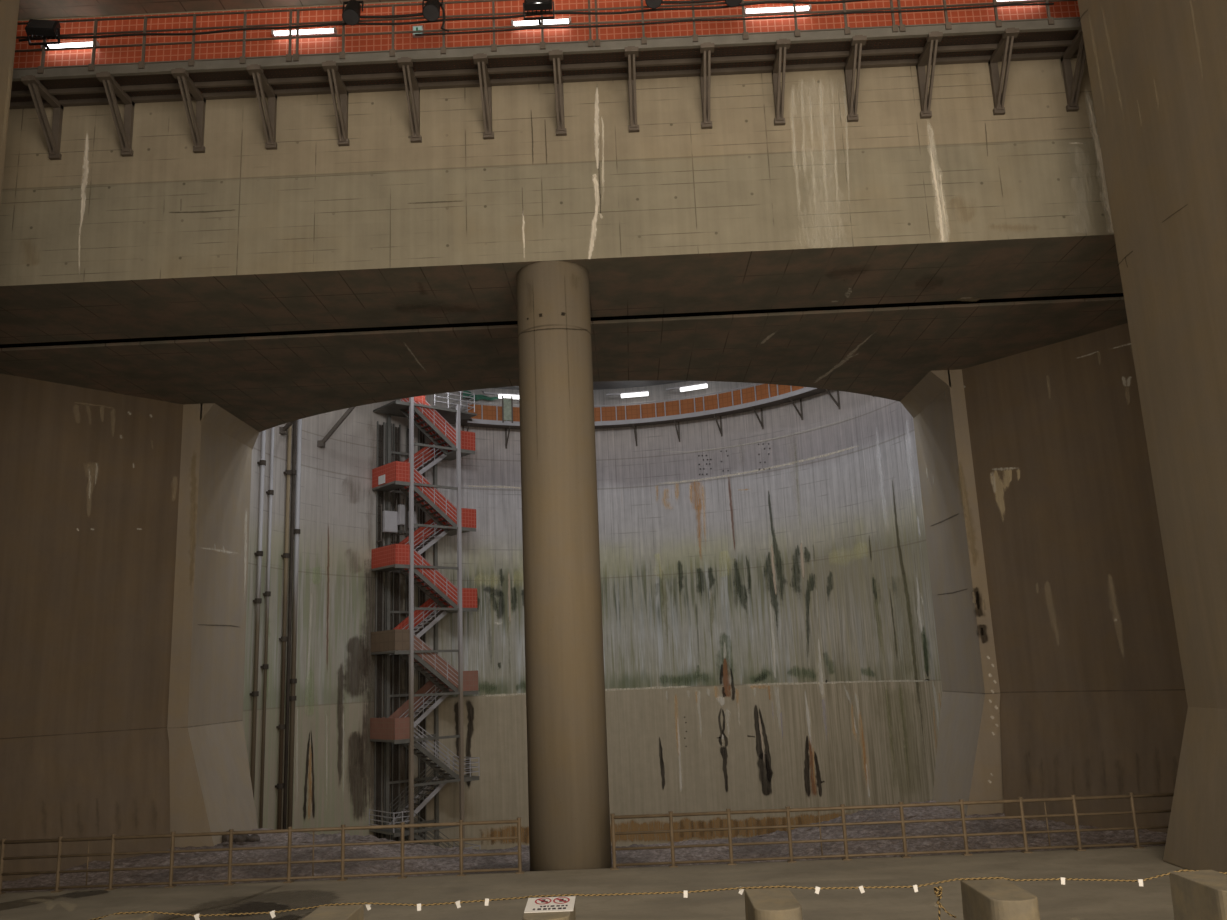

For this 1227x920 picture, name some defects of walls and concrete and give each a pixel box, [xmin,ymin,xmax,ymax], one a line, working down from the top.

damp [303,569,406,819]
damp [454,701,474,786]
damp [652,634,735,792]
damp [748,589,939,796]